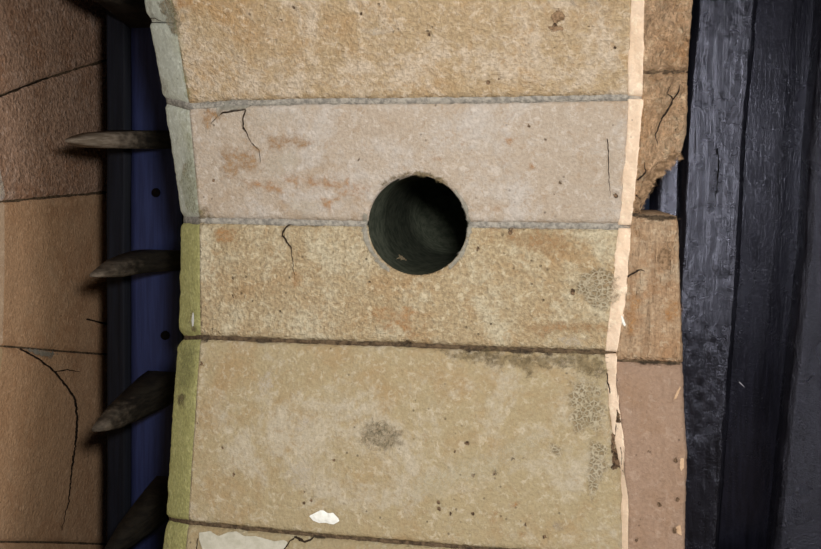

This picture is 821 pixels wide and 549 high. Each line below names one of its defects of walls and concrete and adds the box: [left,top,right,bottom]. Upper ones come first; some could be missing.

crack [0,78,48,97]
crack [211,109,261,162]
crack [282,224,295,278]
crack [20,348,79,531]
peeling [199,531,287,549]